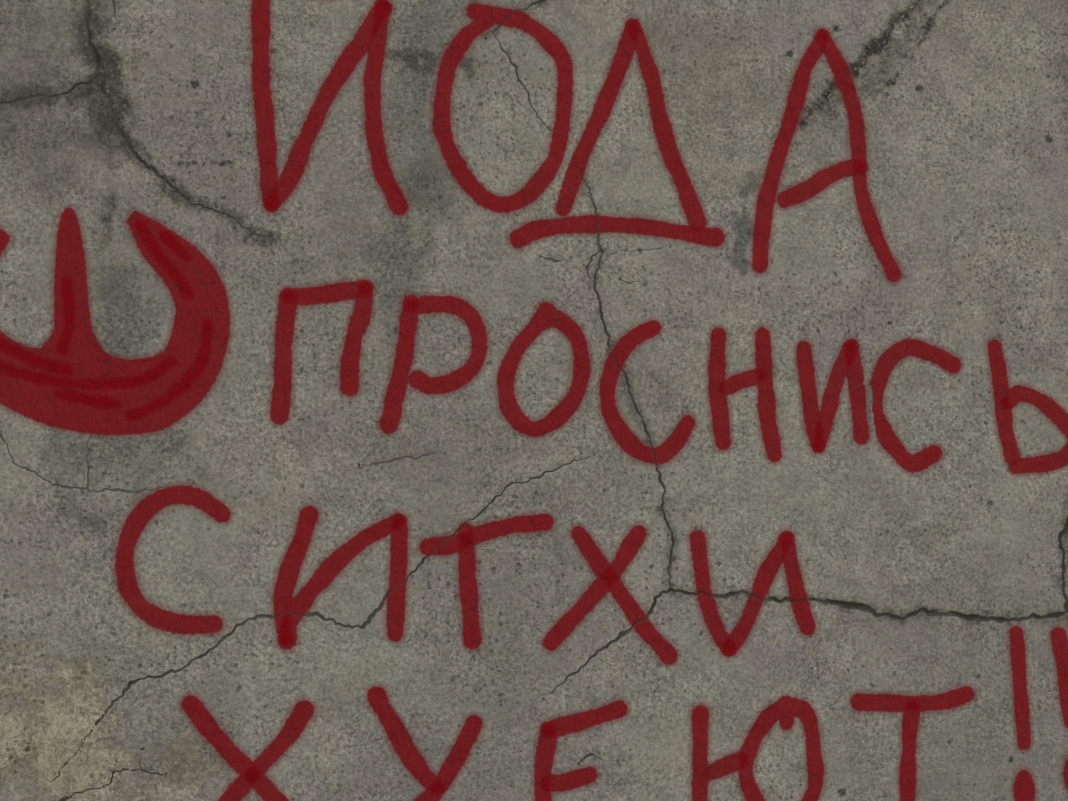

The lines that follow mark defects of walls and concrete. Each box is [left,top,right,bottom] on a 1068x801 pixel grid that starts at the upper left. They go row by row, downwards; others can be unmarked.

crack [0,0,278,246]
crack [483,0,554,136]
crack [0,427,194,512]
crack [540,167,1068,701]
crack [37,449,595,801]
crack [576,751,600,765]